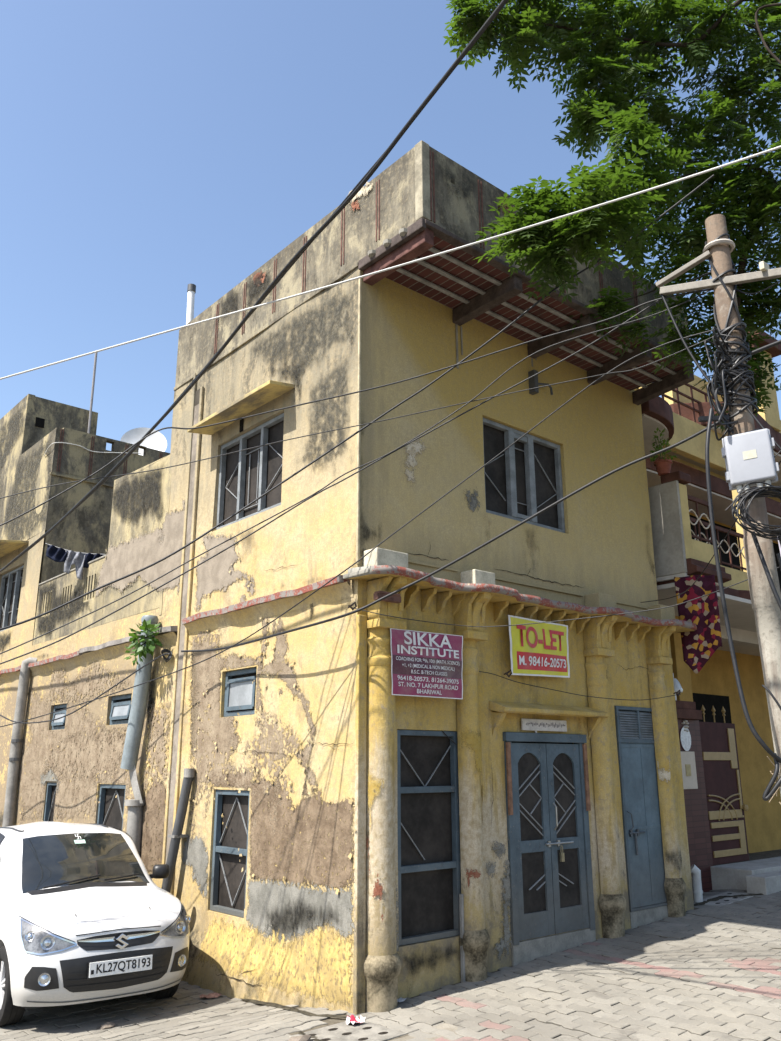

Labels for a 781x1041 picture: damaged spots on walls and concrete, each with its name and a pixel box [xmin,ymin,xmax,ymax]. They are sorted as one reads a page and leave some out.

damp [253,297,349,467]
damp [0,407,23,467]
damp [4,442,51,540]
damp [112,469,162,523]
damp [37,576,97,636]
peeling [194,533,255,611]
peeling [182,616,384,942]
damp [409,949,457,973]